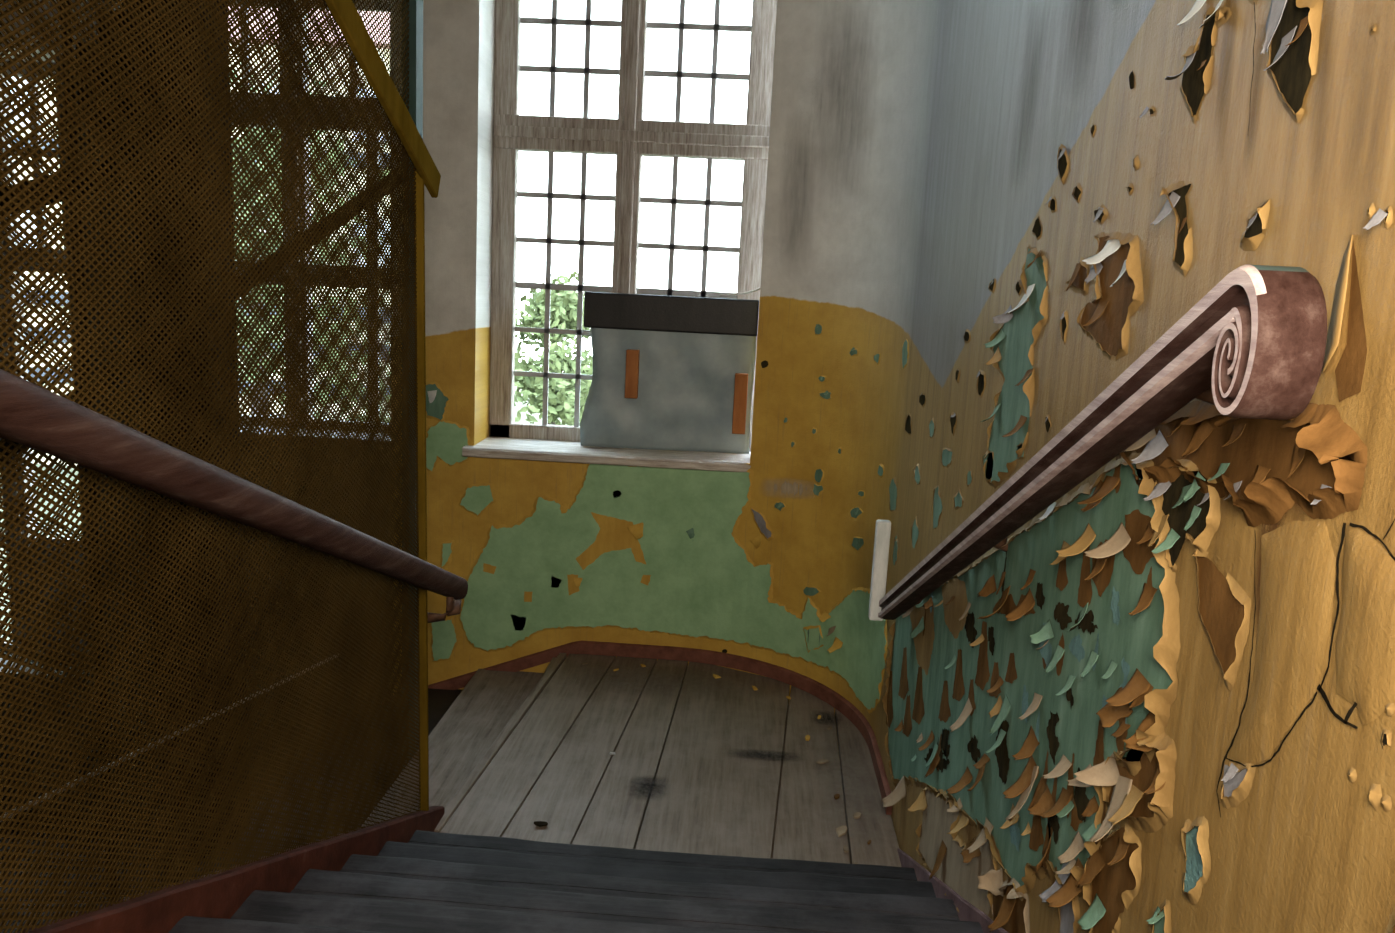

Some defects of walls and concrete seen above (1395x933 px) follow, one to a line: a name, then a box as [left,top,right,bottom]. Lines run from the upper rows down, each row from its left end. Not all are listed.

peeling [1165,0,1232,124]
peeling [1248,0,1323,124]
peeling [426,144,1393,933]
crack [1216,519,1395,818]